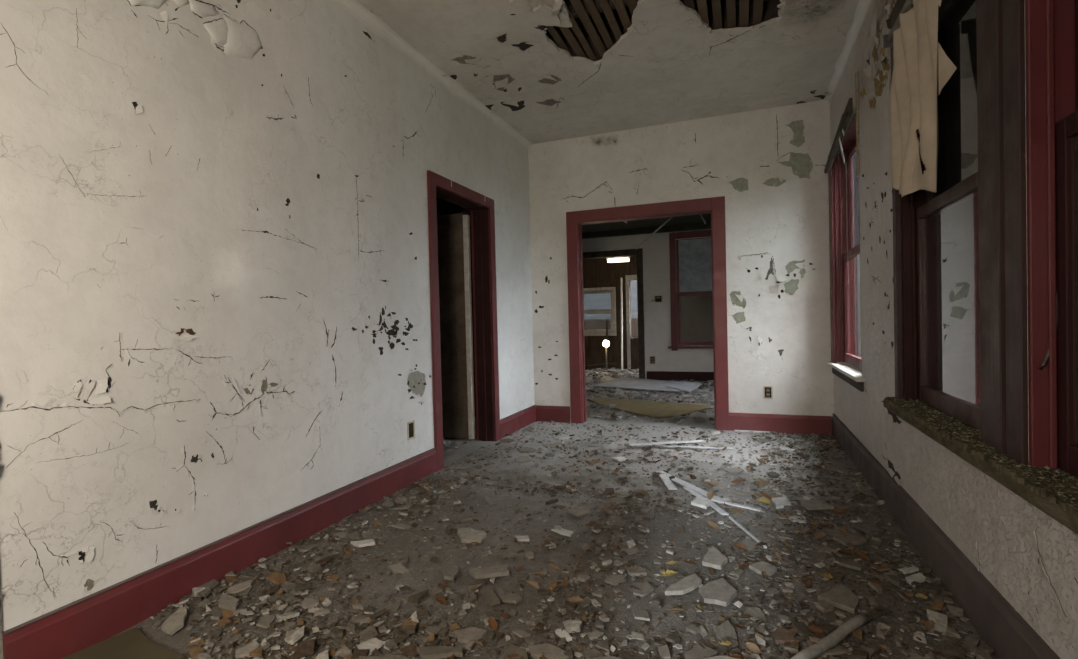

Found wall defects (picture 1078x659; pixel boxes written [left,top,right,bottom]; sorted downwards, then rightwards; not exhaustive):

crack [0,22,50,96]
crack [265,77,313,121]
peeling [441,55,562,111]
flaking render [485,0,653,62]
flaking render [672,0,786,36]
peeling [860,0,896,110]
peeling [762,120,813,187]
peeling [760,254,806,295]
peeling [351,306,418,355]
crack [300,318,343,470]
crack [0,332,296,561]
crack [0,512,71,612]